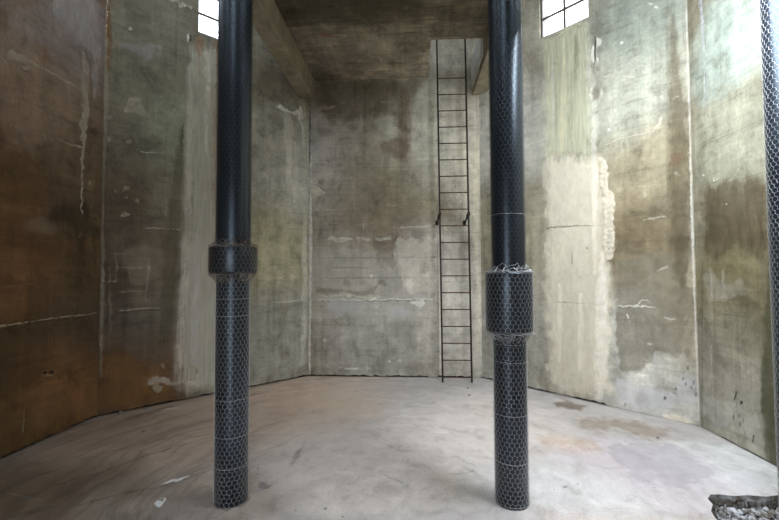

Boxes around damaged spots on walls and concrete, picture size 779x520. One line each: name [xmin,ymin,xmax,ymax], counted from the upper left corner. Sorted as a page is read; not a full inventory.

leakage [54,54,99,236]
leakage [705,180,767,259]
crack [0,313,95,329]